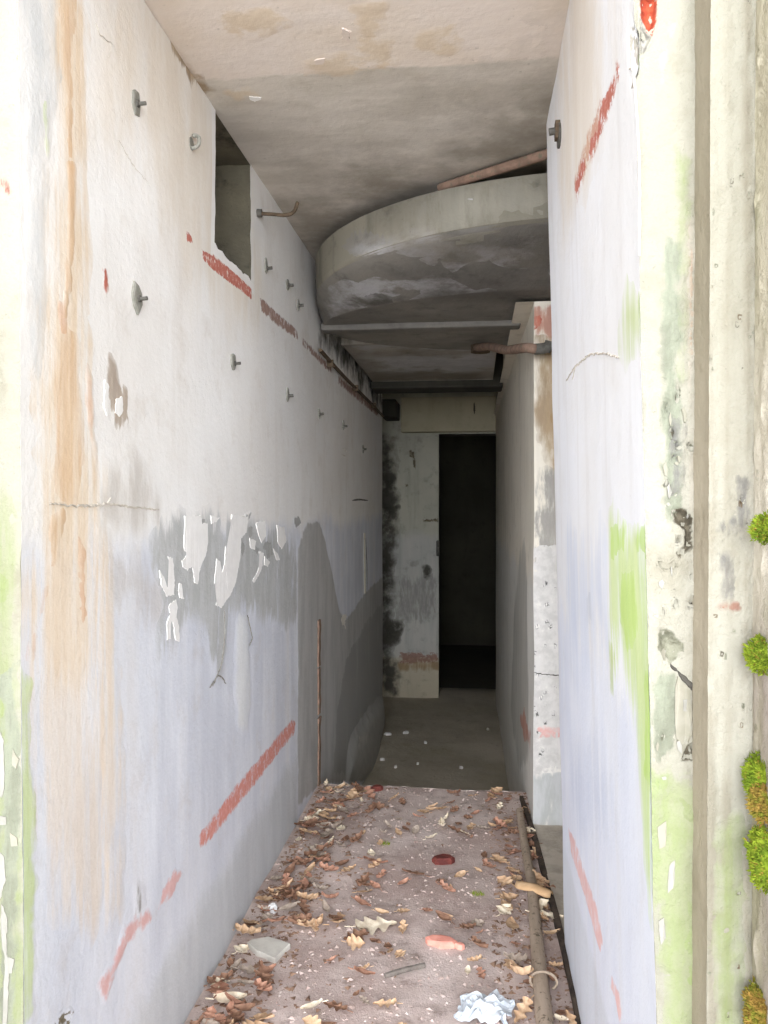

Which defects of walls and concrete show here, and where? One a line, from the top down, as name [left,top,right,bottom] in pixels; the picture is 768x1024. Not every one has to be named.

spalling [630,0,660,82]
peeling [103,352,130,432]
crack [566,352,619,381]
rust [21,0,129,950]
crack [49,498,159,510]
peeling [147,500,301,694]
water stain [120,0,641,1024]
water stain [634,522,646,559]
peeling [648,383,694,780]
peeling [657,821,667,849]